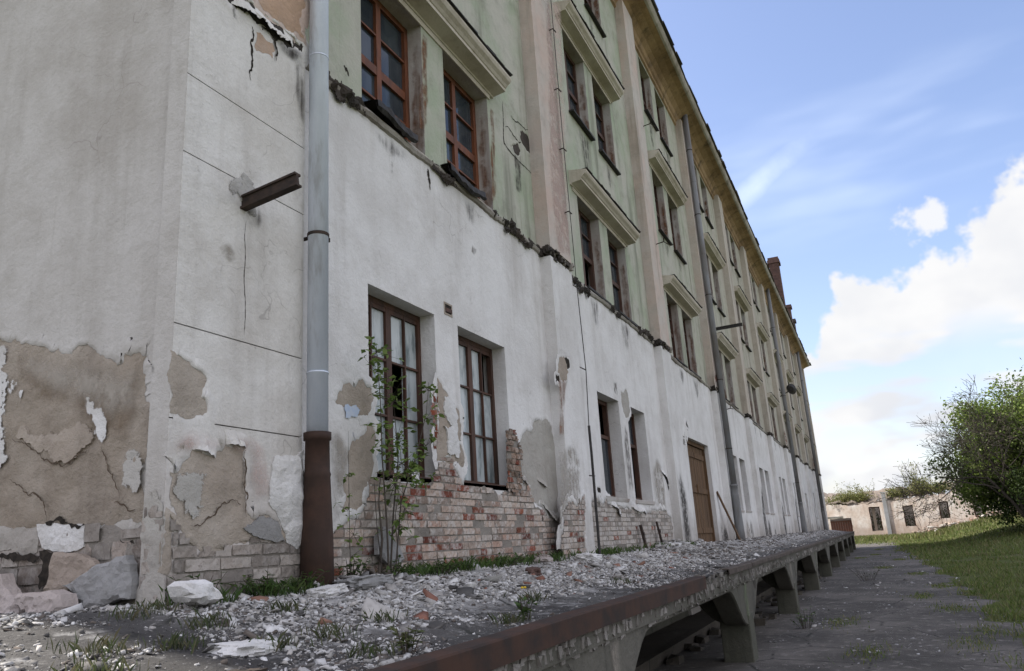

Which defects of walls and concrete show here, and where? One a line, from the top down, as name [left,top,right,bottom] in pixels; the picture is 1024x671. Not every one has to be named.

spalling [0,329,300,605]